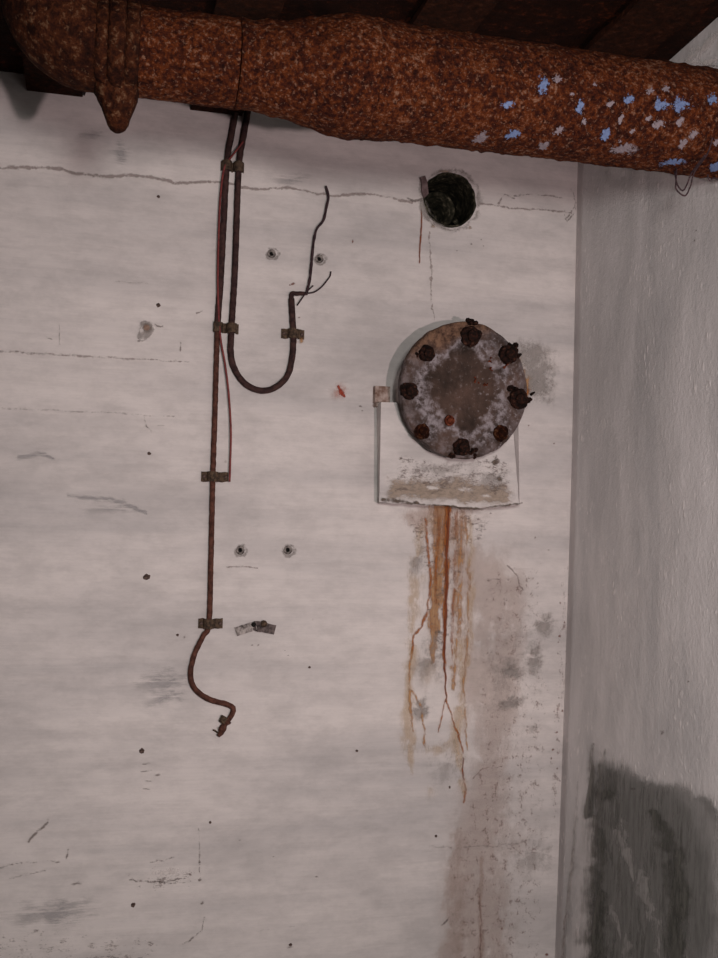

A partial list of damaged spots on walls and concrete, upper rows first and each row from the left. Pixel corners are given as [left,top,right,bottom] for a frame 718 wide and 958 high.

crack [5,166,423,204]
crack [480,194,574,220]
corrosion [409,505,471,803]
leakage [584,757,718,958]